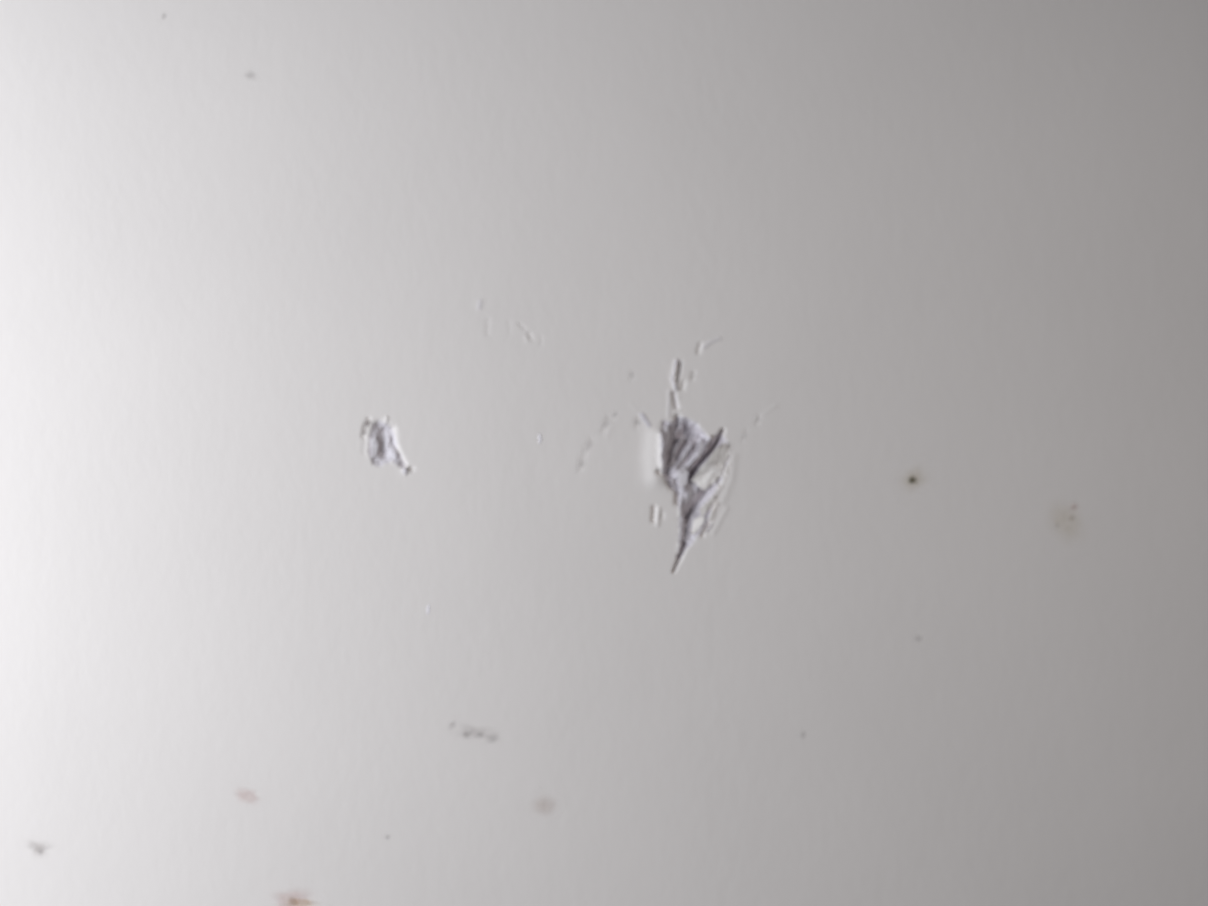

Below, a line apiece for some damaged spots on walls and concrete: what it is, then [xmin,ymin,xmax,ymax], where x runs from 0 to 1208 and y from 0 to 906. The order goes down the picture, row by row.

flaking render [359,414,417,477]
flaking render [575,336,779,575]